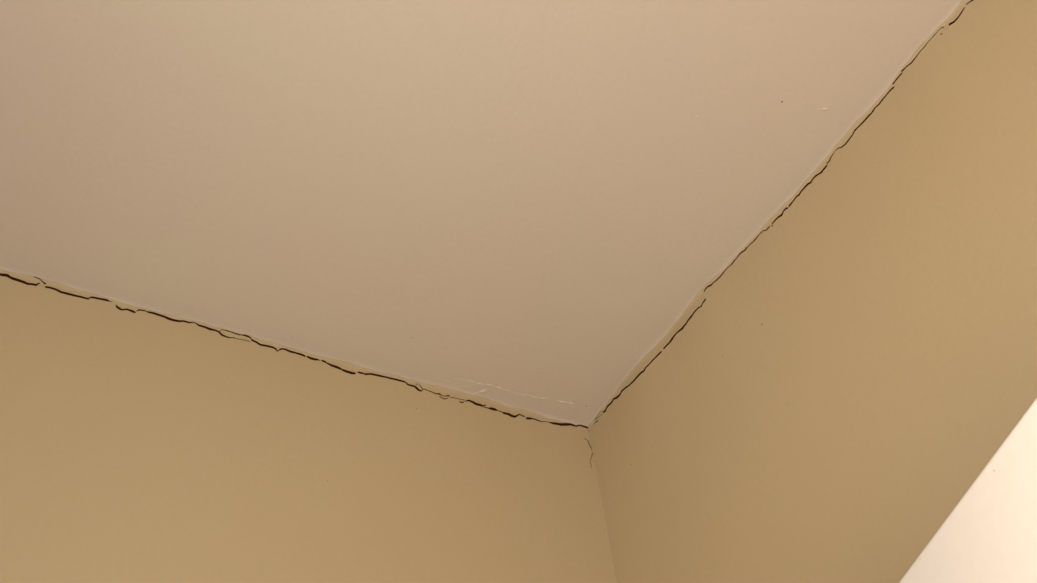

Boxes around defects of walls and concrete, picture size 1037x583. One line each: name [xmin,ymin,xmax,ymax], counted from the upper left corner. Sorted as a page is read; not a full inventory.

crack [0,0,974,468]